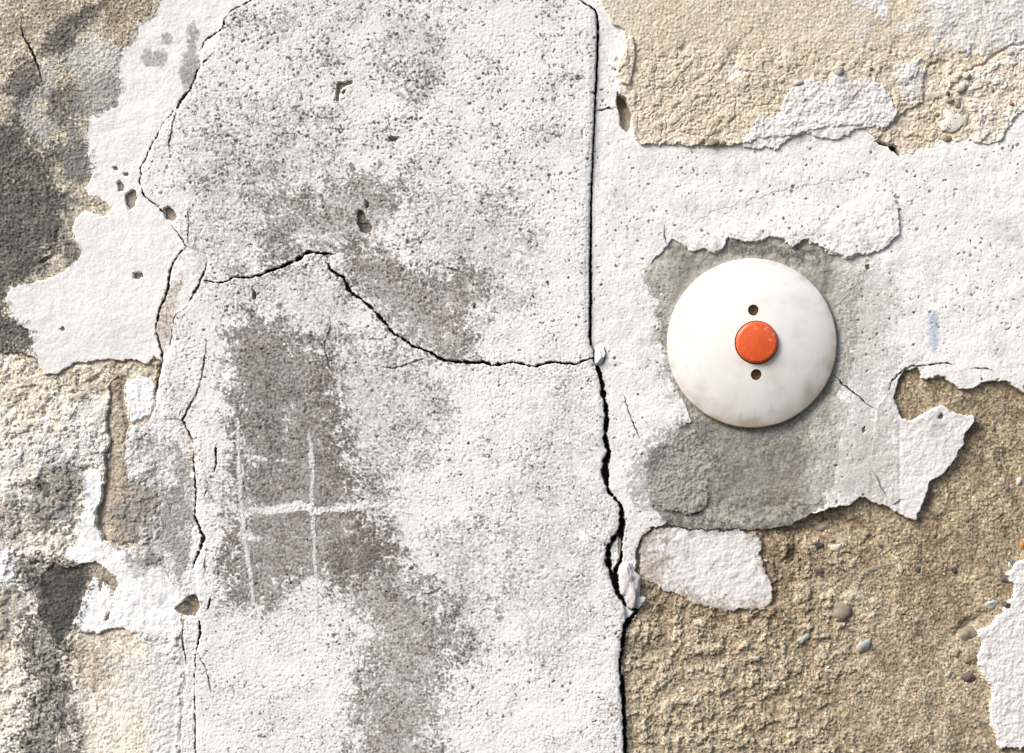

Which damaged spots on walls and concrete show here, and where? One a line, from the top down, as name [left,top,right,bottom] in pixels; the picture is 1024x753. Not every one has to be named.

damp [0,0,150,359]
flaking render [600,0,1024,156]
peeling [0,0,200,753]
crack [139,0,640,753]
spalling [621,368,1024,753]